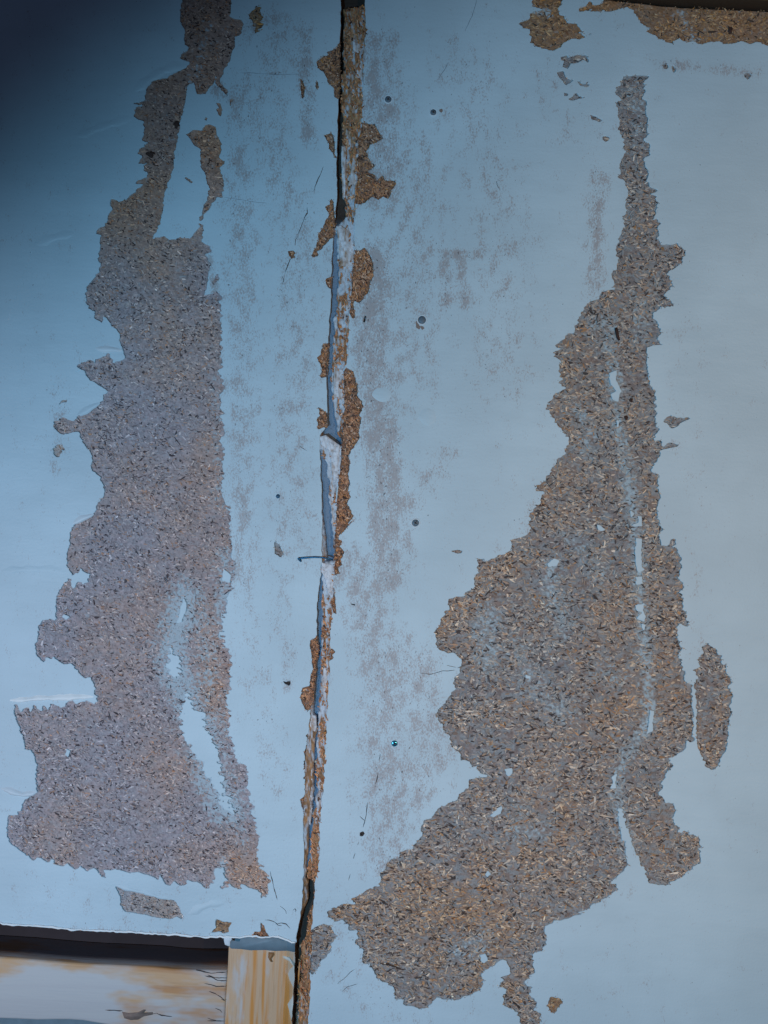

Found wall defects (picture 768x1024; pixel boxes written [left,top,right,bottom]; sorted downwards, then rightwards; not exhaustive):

peeling [7,0,271,897]
peeling [116,887,183,919]
crack [269,0,368,1024]
peeling [308,74,733,1024]
peeling [579,0,768,46]